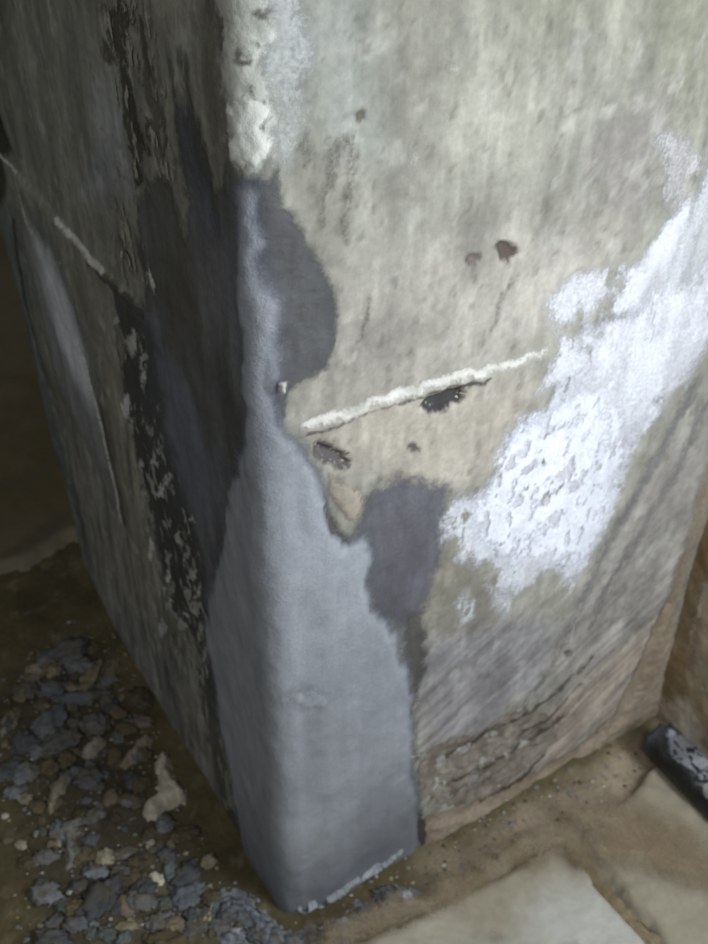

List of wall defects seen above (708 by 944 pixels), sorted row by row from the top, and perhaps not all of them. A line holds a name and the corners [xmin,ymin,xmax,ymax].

crack [0,154,46,373]
crack [51,216,143,319]
spalling [102,0,175,295]
peeling [112,307,209,688]
leakage [112,0,339,833]
leakage [325,505,344,542]
crack [301,349,547,435]
leakage [358,131,708,693]